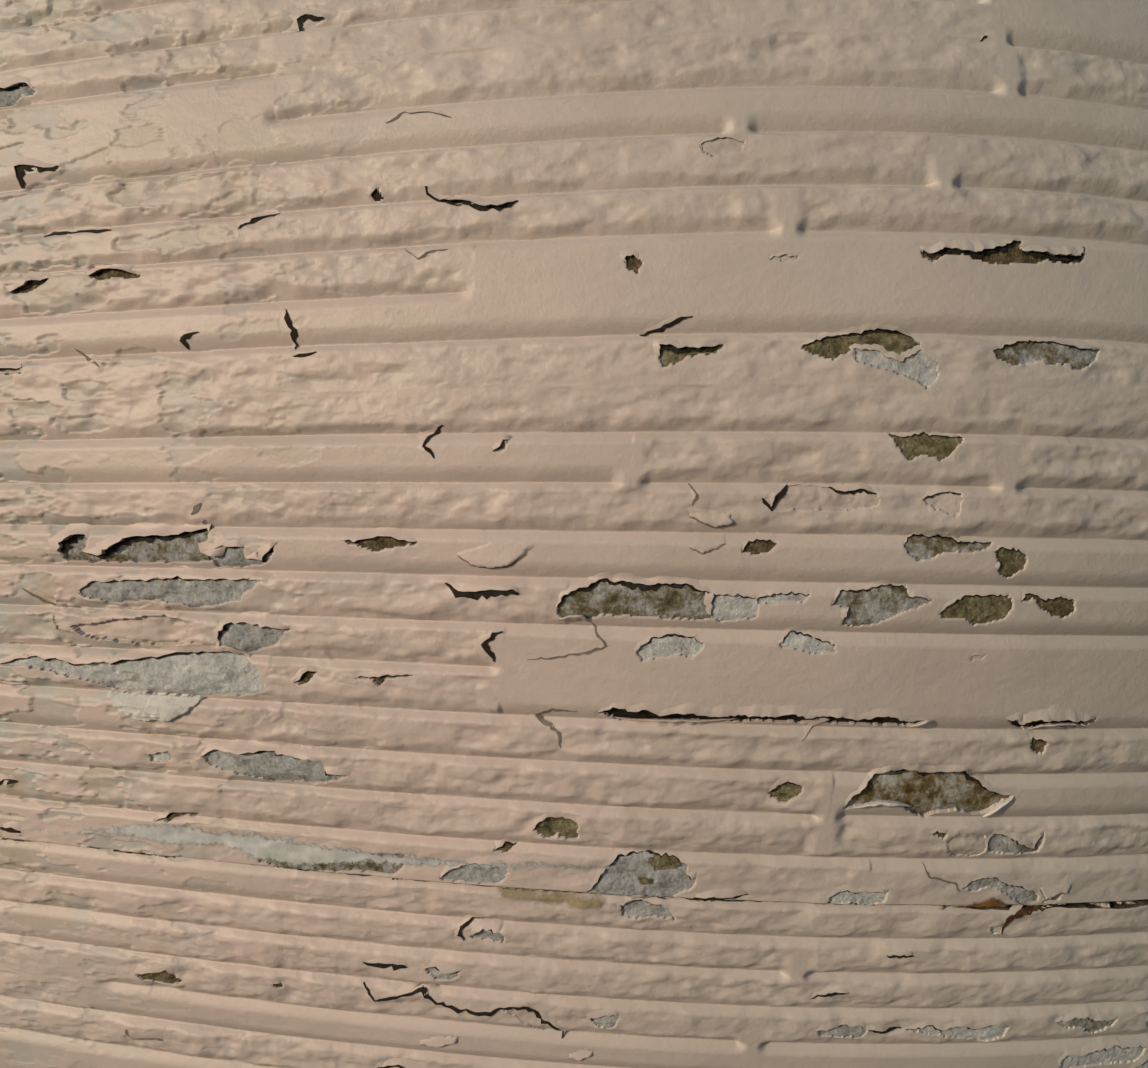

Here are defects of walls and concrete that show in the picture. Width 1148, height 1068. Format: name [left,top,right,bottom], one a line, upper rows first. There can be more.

peeling [920,237,1085,265]
peeling [800,323,938,389]
peeling [994,336,1100,370]
peeling [888,428,963,460]
peeling [903,530,1027,578]
peeling [0,522,290,722]
peeling [555,572,809,660]
peeling [831,579,1075,626]
peeling [198,739,350,782]
peeling [843,763,1014,817]
peeling [585,846,748,919]
crack [998,900,1065,934]